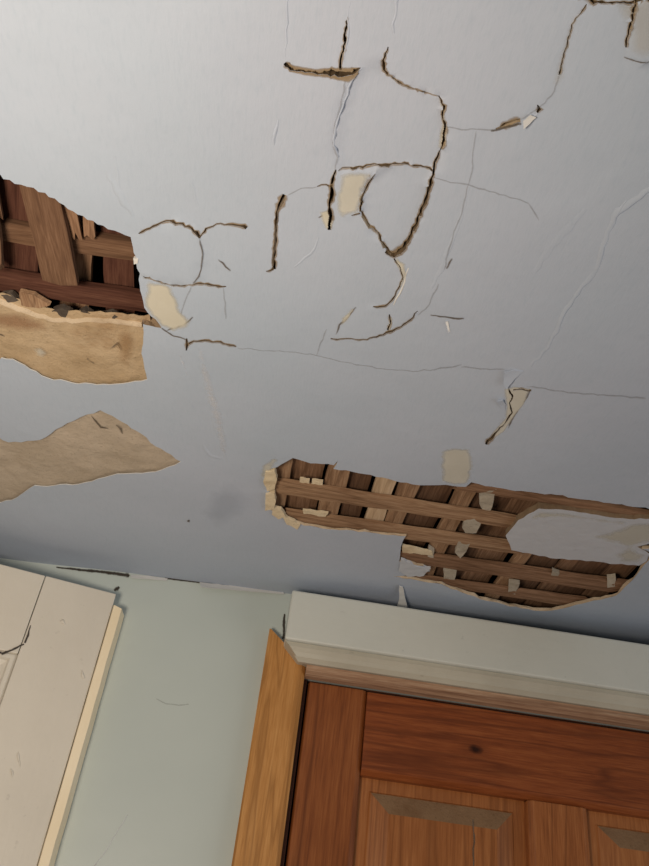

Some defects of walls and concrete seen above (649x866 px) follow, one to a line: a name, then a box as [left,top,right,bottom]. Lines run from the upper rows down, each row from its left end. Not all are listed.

crack [491,105,543,131]
crack [284,1,463,341]
crack [139,220,247,288]
crack [268,194,287,271]
flaking render [0,284,187,385]
crack [163,318,236,349]
flaking render [0,410,181,503]
flaking render [263,460,328,529]
flaking render [443,450,471,484]
flaking render [398,543,433,577]
flaking render [505,502,649,566]